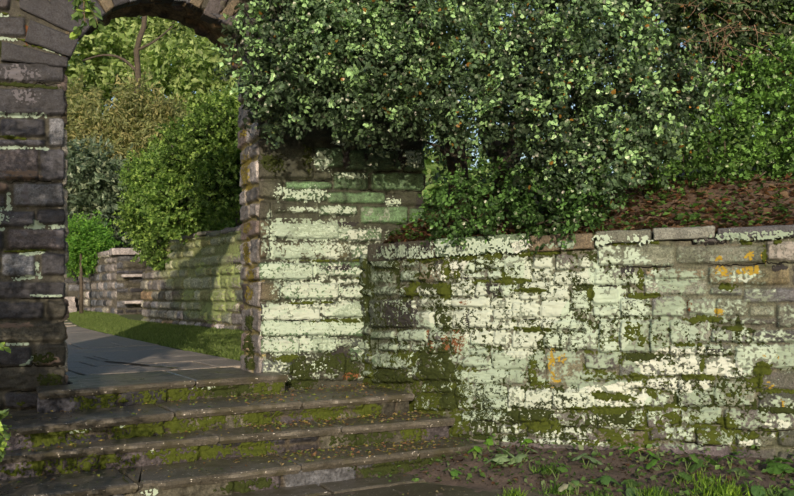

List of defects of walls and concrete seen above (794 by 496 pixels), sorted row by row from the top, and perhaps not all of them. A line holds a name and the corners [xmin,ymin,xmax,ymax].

leakage [768,239,794,272]
leakage [379,291,418,334]
leakage [331,345,358,363]